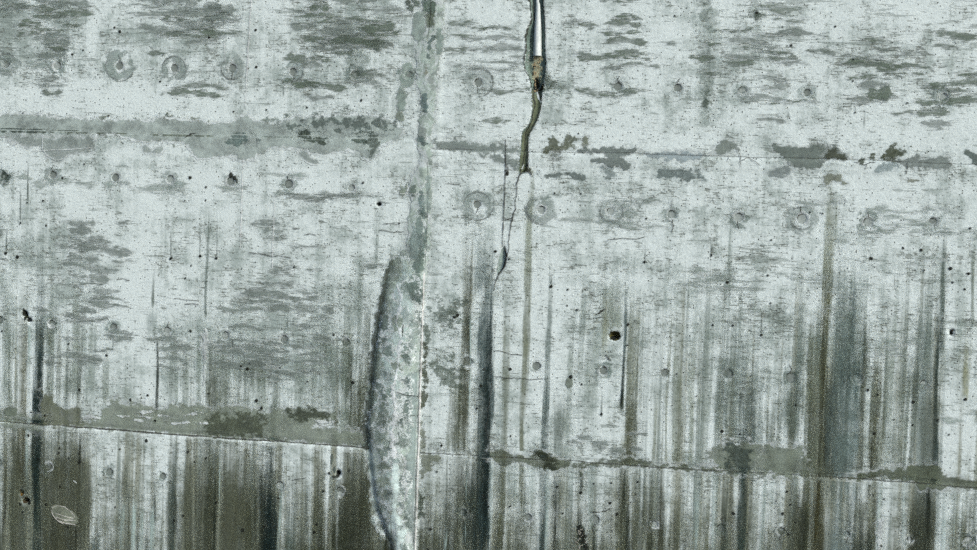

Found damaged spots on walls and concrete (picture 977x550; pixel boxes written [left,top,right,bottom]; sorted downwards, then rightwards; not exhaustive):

leakage [0,390,365,446]
leakage [418,421,441,479]
leakage [489,437,814,484]
leakage [848,465,977,514]
leakage [875,519,885,550]